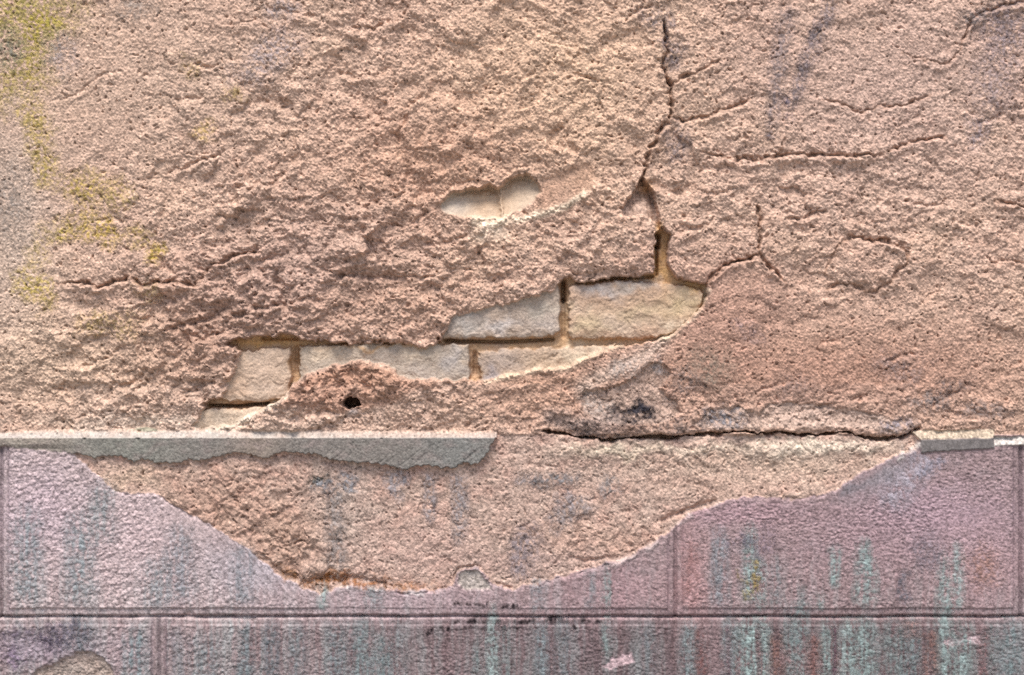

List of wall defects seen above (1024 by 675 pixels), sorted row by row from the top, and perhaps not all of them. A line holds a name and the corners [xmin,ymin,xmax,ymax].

crack [899,0,1024,66]
crack [639,18,756,181]
crack [819,93,935,116]
crack [694,133,949,164]
crack [992,197,1024,209]
crack [54,248,265,291]
crack [704,201,789,287]
crack [822,233,912,296]
flaking render [191,179,708,429]
flaking render [74,362,920,597]